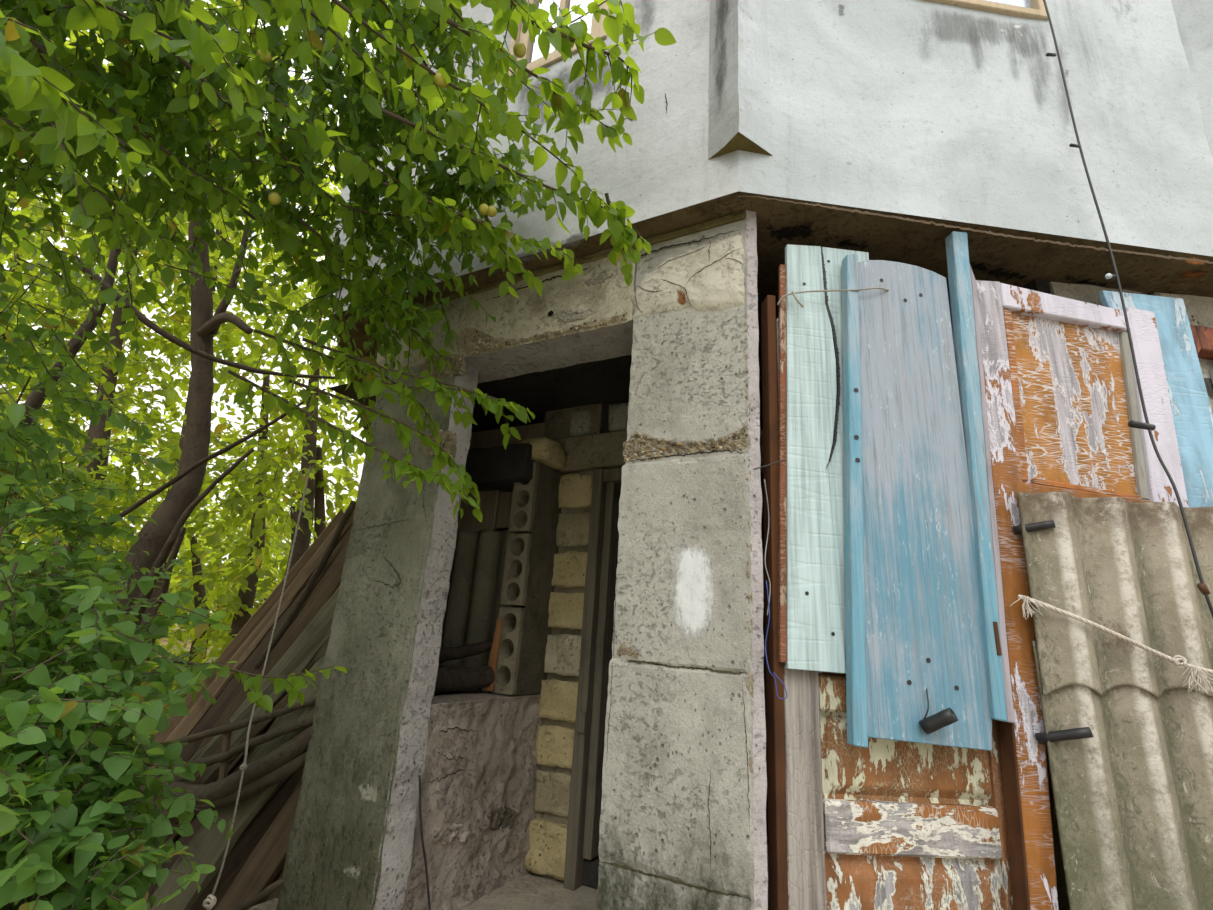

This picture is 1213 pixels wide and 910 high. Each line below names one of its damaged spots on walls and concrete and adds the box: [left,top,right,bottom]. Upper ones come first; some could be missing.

leakage [716,0,728,90]
crack [487,268,588,300]
crack [635,230,742,312]
spalling [738,196,1213,264]